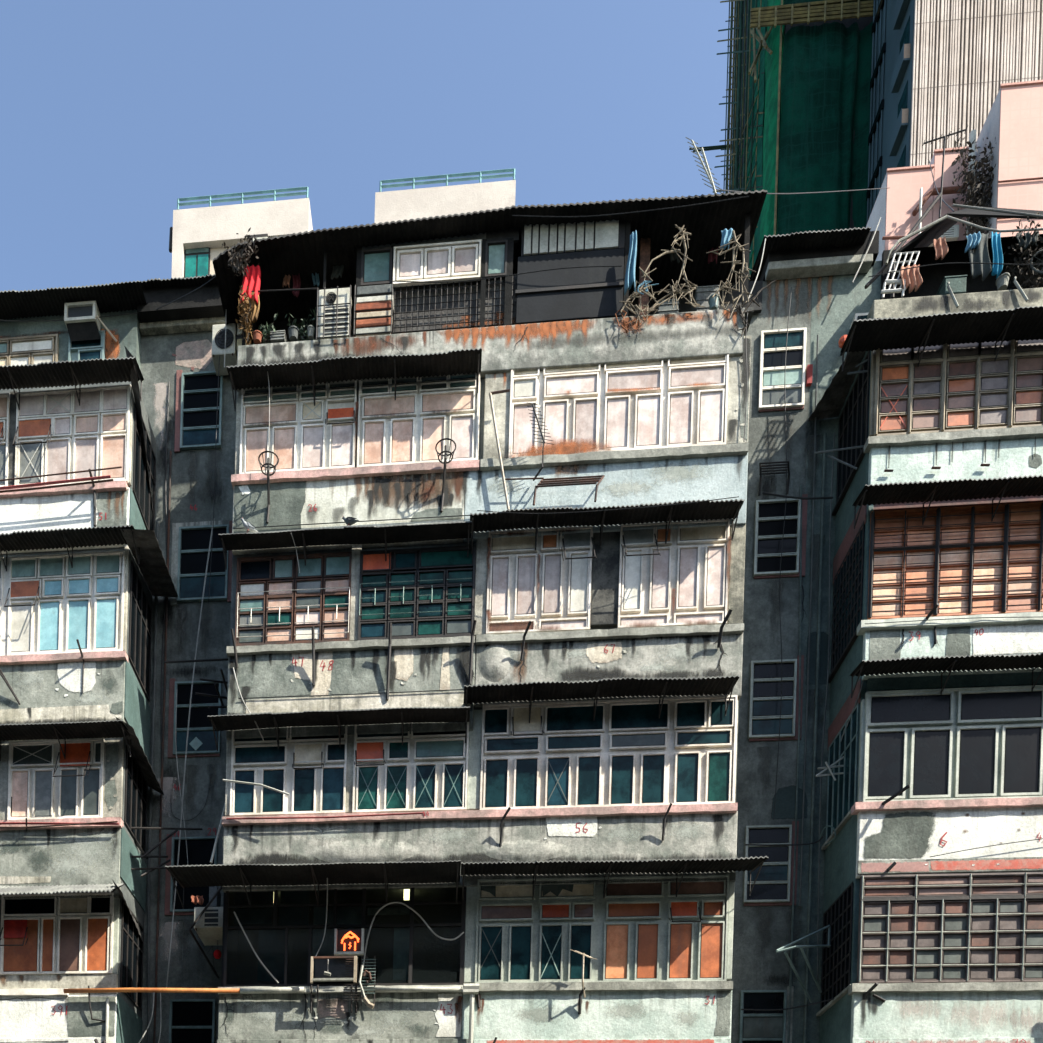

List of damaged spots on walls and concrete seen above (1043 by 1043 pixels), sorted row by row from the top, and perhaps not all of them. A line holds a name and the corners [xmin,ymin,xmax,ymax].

peeling [172,339,213,371]
corrosion [333,331,426,354]
corrosion [445,313,591,346]
corrosion [620,312,704,331]
corrosion [519,441,602,474]
peeling [0,662,122,724]
peeling [246,646,471,714]
leakage [373,649,396,690]
leakage [420,647,439,676]
leakage [457,646,470,685]
leakage [543,635,722,682]
leakage [0,827,117,875]